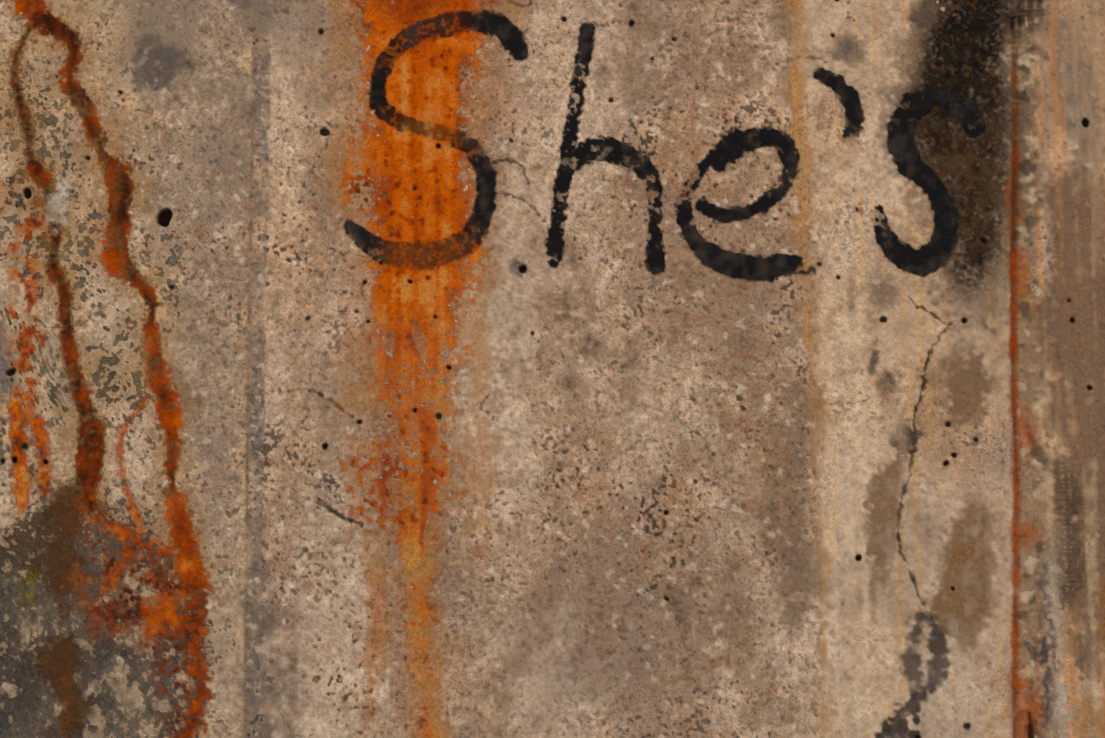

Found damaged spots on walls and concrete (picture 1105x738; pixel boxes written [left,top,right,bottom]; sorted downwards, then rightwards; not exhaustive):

rust [5,0,215,738]
rust [338,0,497,738]
crack [910,352,931,463]
leakage [875,506,987,738]
leakage [896,0,1050,295]
rust [1009,142,1034,738]
leakage [1040,166,1105,738]